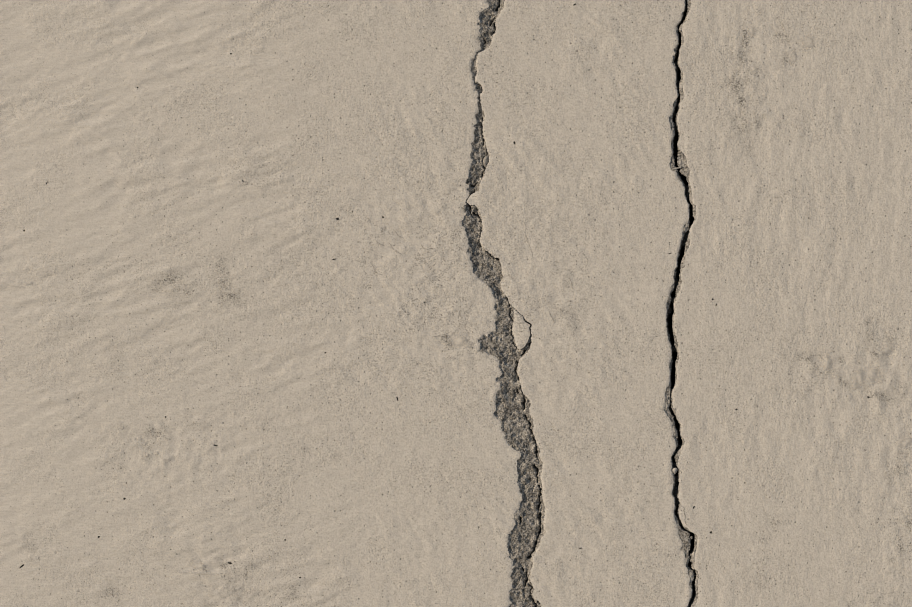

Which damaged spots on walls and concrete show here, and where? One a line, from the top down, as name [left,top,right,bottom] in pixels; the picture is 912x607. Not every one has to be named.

crack [461,0,546,607]
crack [664,0,699,607]